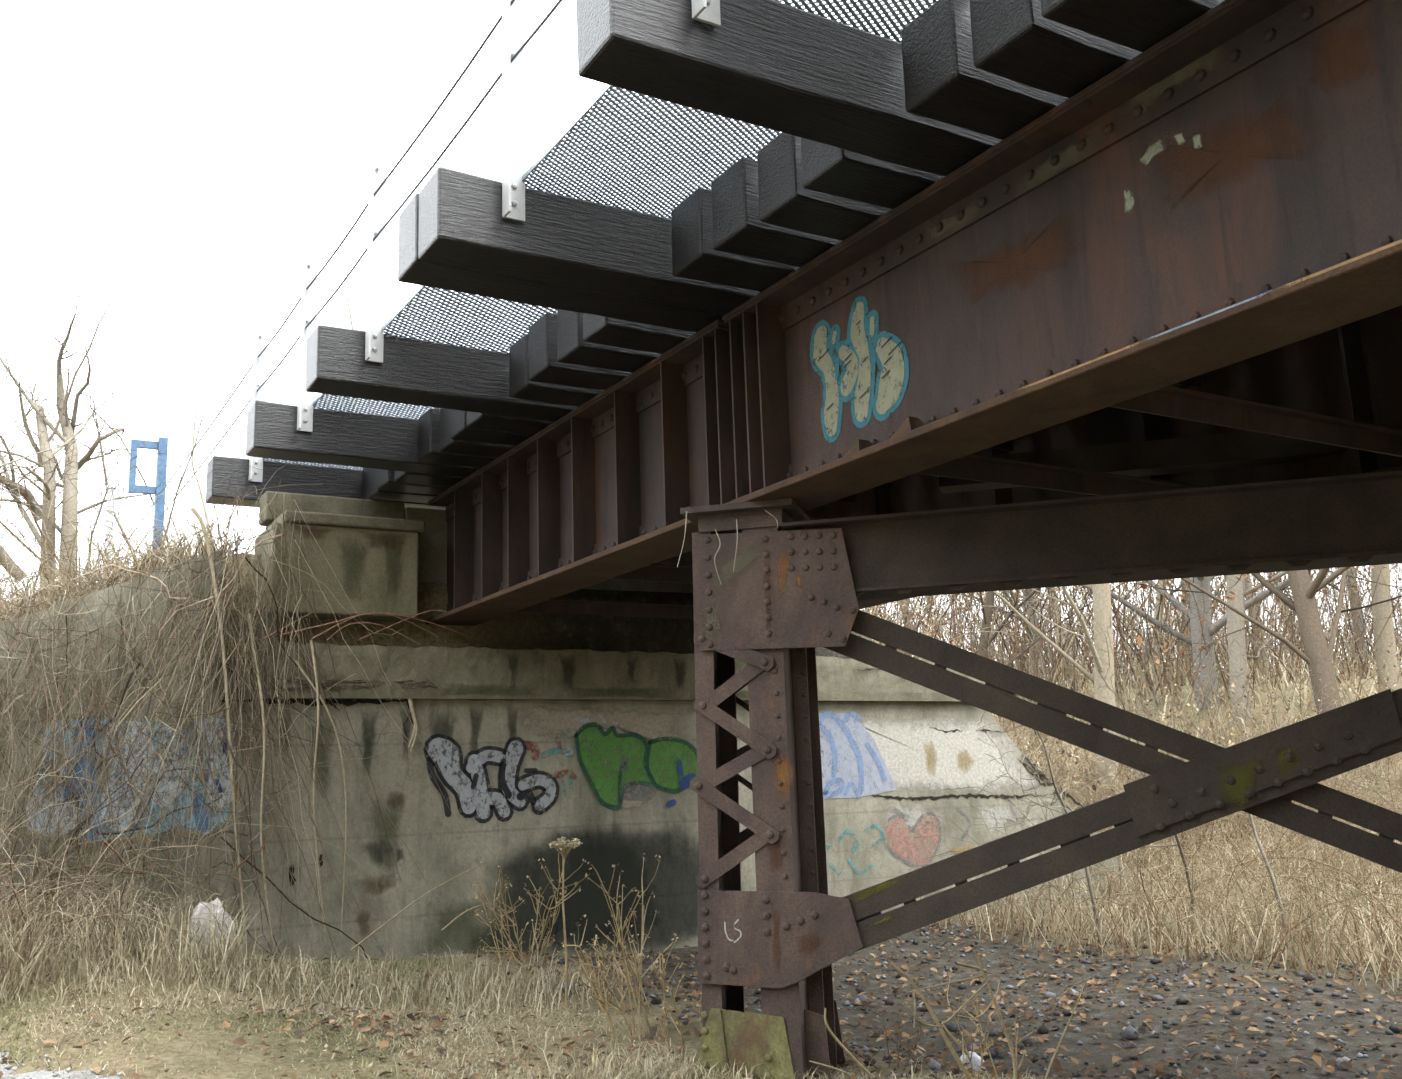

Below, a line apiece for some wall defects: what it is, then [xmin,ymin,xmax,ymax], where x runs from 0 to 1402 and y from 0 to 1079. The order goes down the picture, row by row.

rust [776,760,791,794]